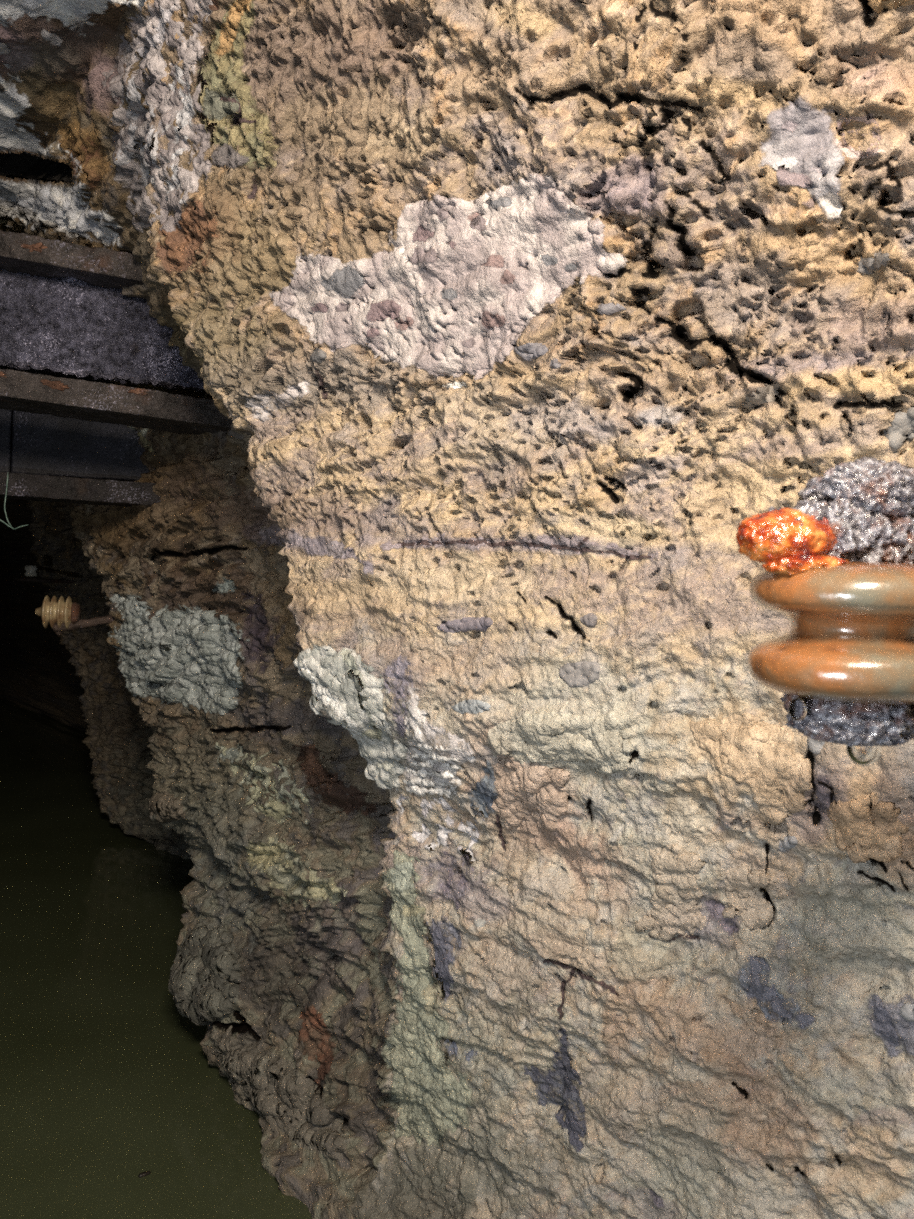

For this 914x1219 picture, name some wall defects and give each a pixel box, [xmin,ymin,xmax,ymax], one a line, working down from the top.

spalling [270,173,628,380]
crack [514,84,797,417]
crack [150,546,249,561]
corrosion [762,555,849,575]
water stain [105,578,274,716]
water stain [207,741,348,909]
water stain [293,645,415,813]
water stain [381,760,498,1146]
crack [543,959,619,1020]
crack [750,843,776,930]
crack [805,745,835,826]